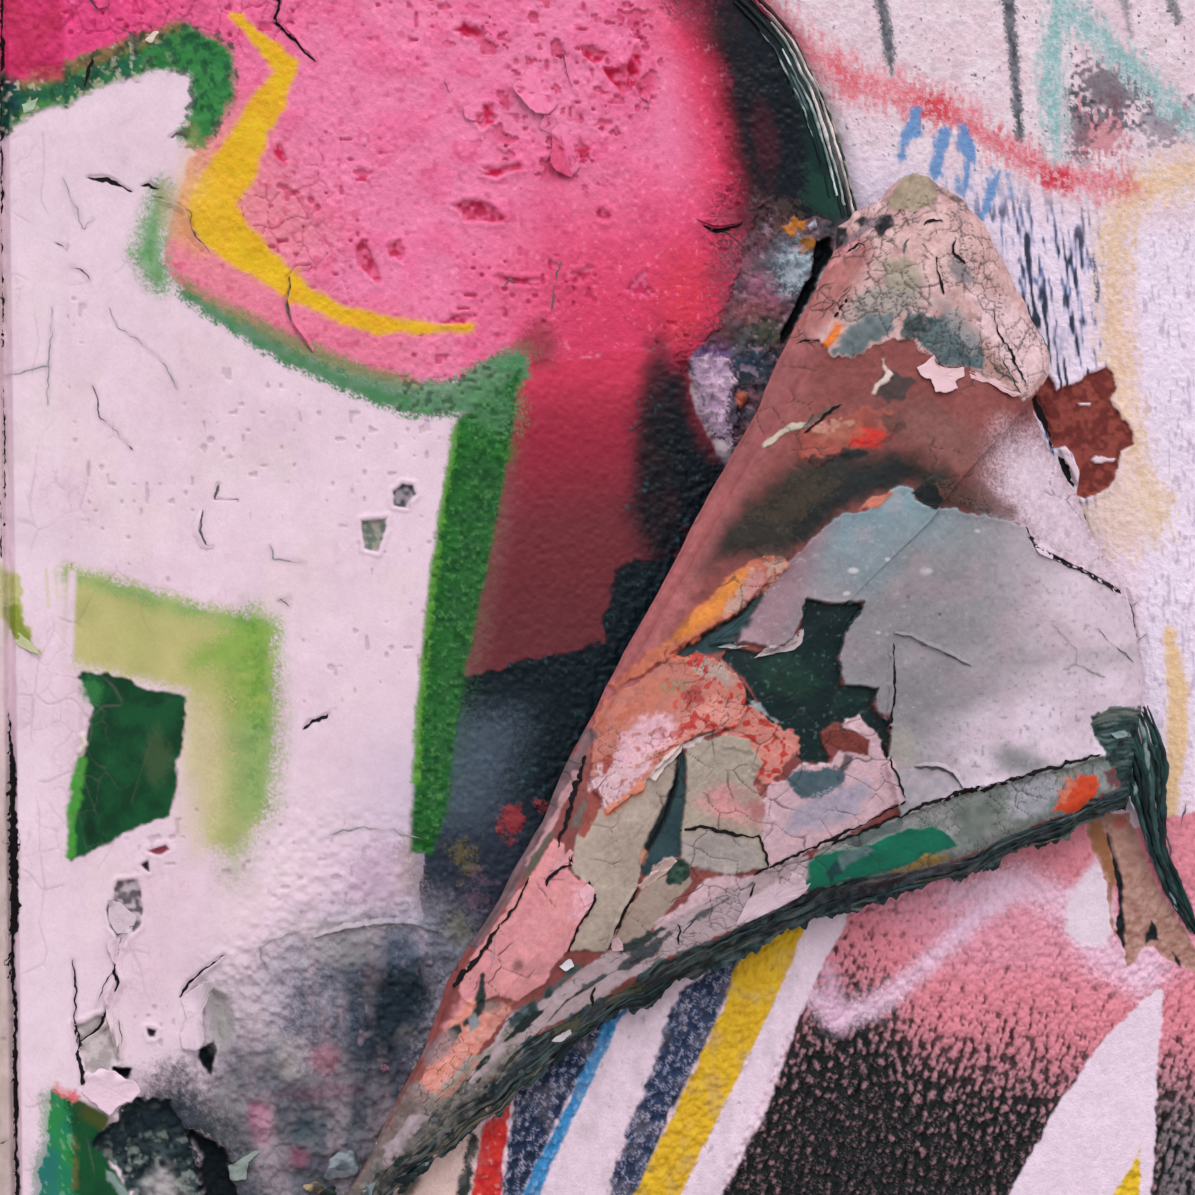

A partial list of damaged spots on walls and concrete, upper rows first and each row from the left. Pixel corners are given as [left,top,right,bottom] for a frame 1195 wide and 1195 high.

crack [273,0,318,61]
peeling [512,69,581,177]
crack [286,264,314,352]
peeling [346,173,1195,1195]
crack [0,712,22,1195]
peeling [107,844,172,965]
peeling [179,978,215,1051]
spalling [73,988,202,1195]
peeling [228,1149,263,1181]